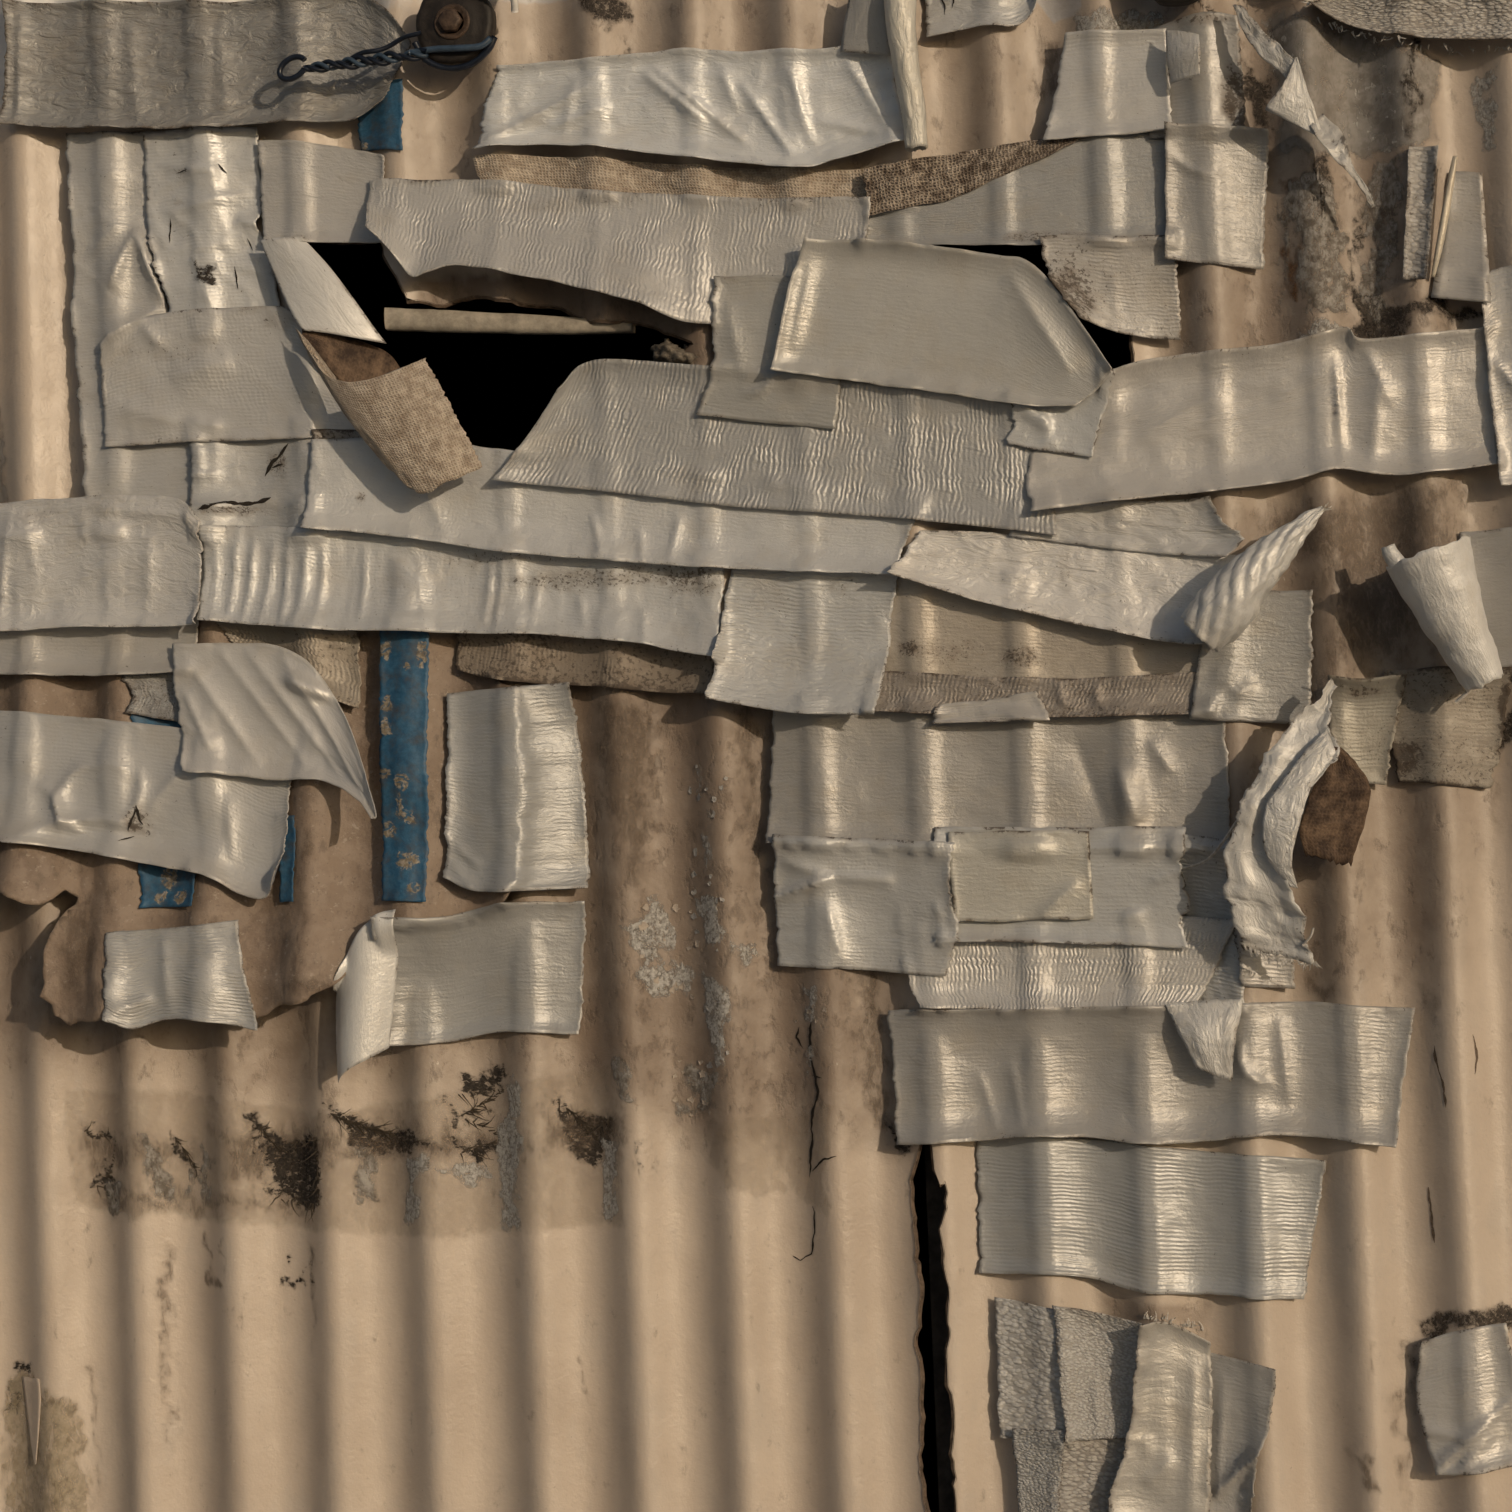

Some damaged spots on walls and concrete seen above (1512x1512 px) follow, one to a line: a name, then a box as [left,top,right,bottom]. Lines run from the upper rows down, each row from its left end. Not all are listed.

water stain [1242,68,1274,130]
water stain [1401,38,1424,138]
water stain [1312,154,1333,214]
water stain [1353,263,1386,337]
water stain [443,1099,496,1163]
crack [793,1023,836,1261]
water stain [90,1159,116,1197]